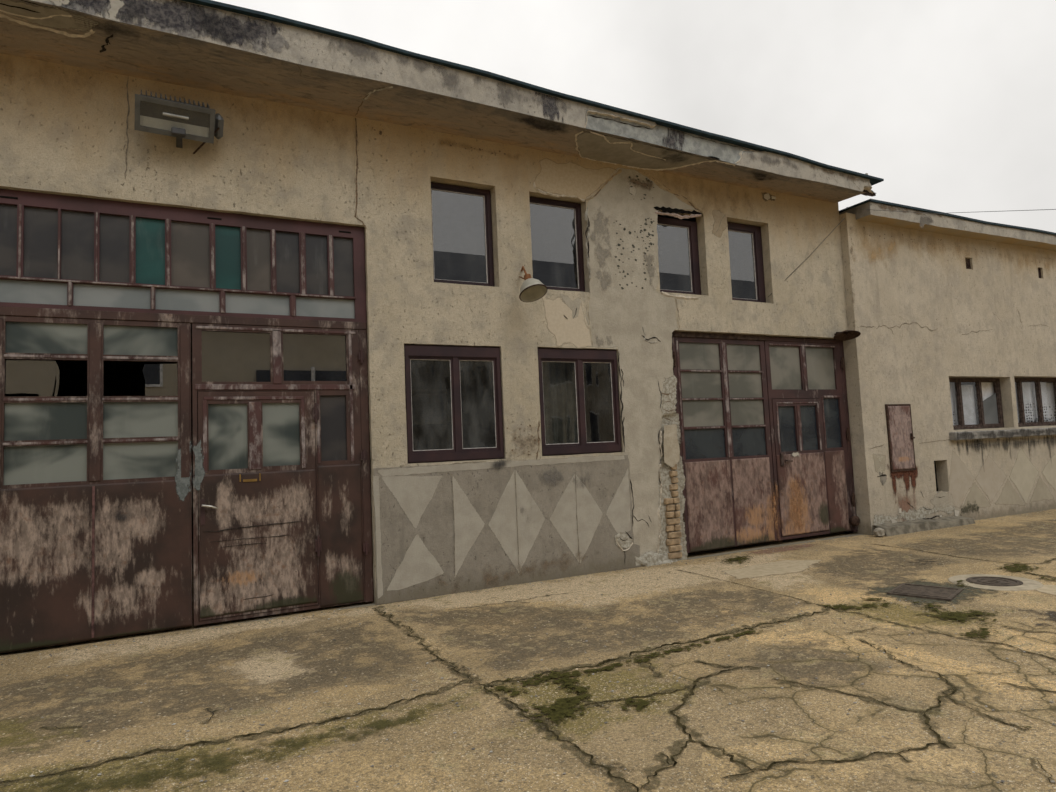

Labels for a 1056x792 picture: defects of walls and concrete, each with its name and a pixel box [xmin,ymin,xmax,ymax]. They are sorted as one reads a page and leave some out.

leakage [50,0,289,53]
crack [353,85,395,229]
flaking render [533,110,764,566]
leakage [957,429,1056,459]
corrosion [887,465,918,519]